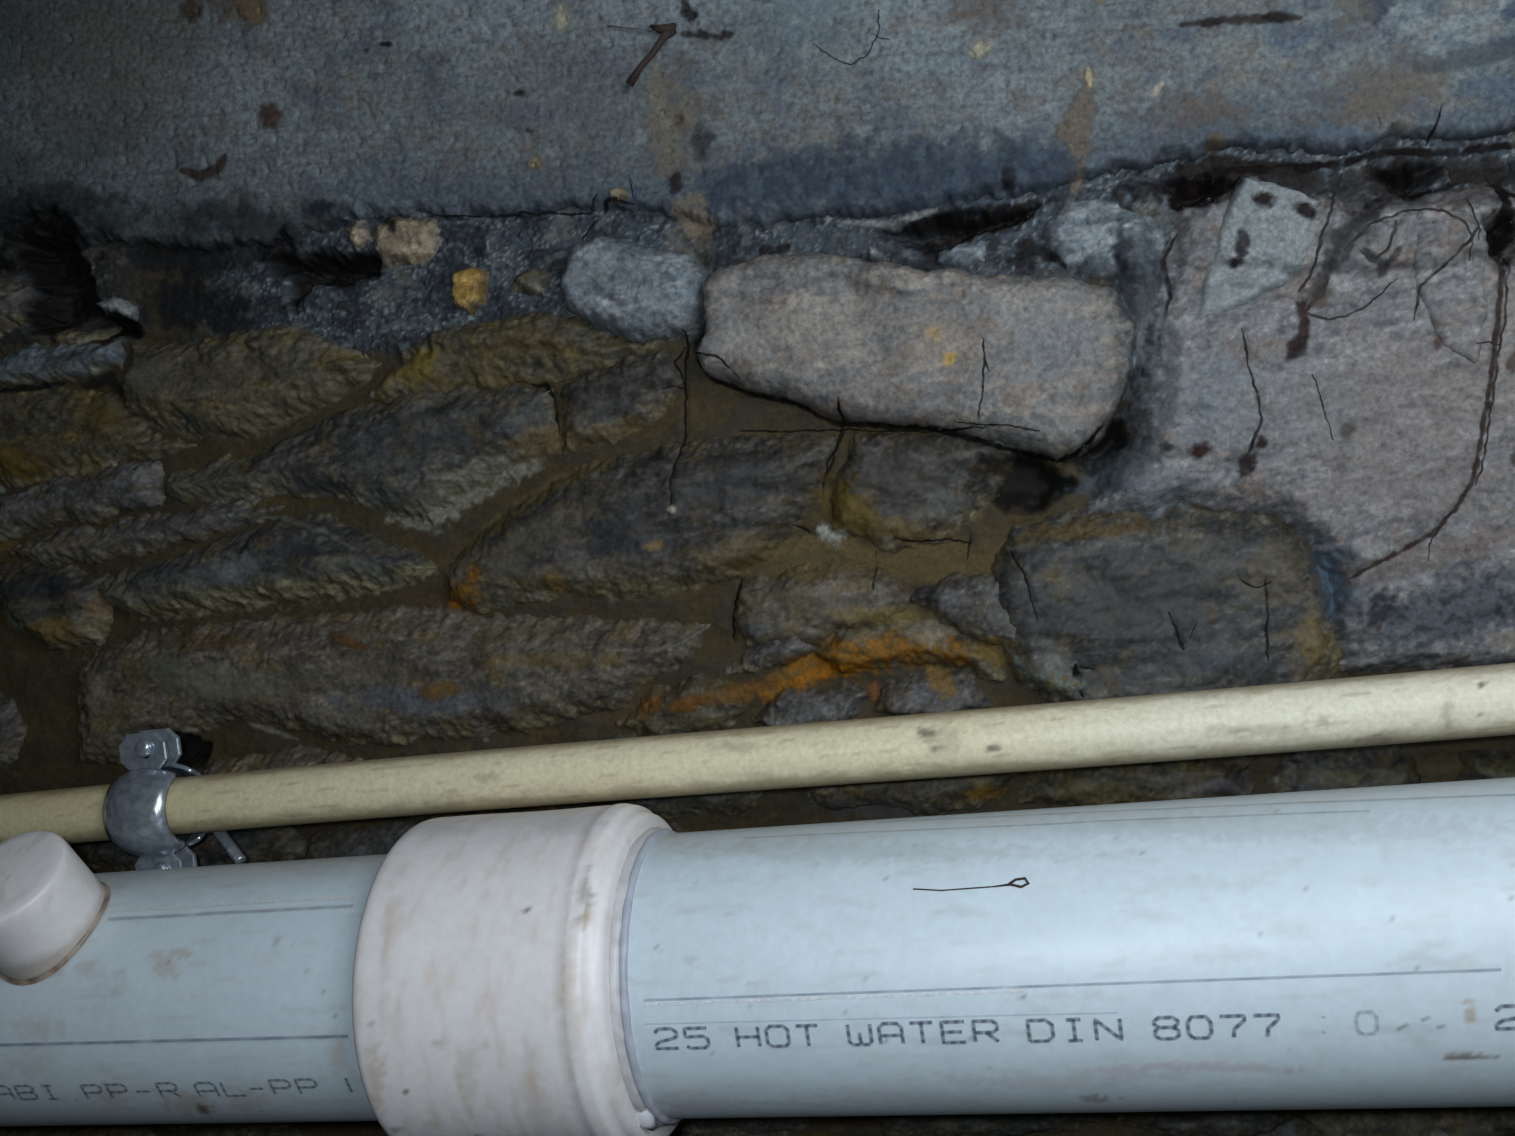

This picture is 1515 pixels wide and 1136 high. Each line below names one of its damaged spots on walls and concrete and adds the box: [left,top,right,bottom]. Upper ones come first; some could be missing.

damp [180,154,227,181]
damp [0,188,109,280]
crack [663,233,1178,516]
crack [1205,105,1515,579]
crack [794,525,829,542]
crack [872,534,972,591]
crack [1010,550,1038,620]
crack [1168,612,1198,650]
crack [1239,578,1273,661]
corrosion [641,633,968,718]